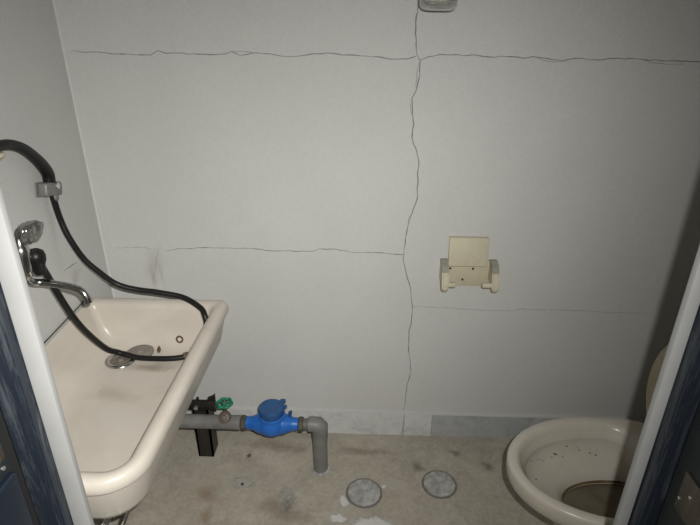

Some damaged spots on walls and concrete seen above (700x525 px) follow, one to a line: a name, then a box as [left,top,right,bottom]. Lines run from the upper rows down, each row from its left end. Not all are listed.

crack [78,0,700,434]